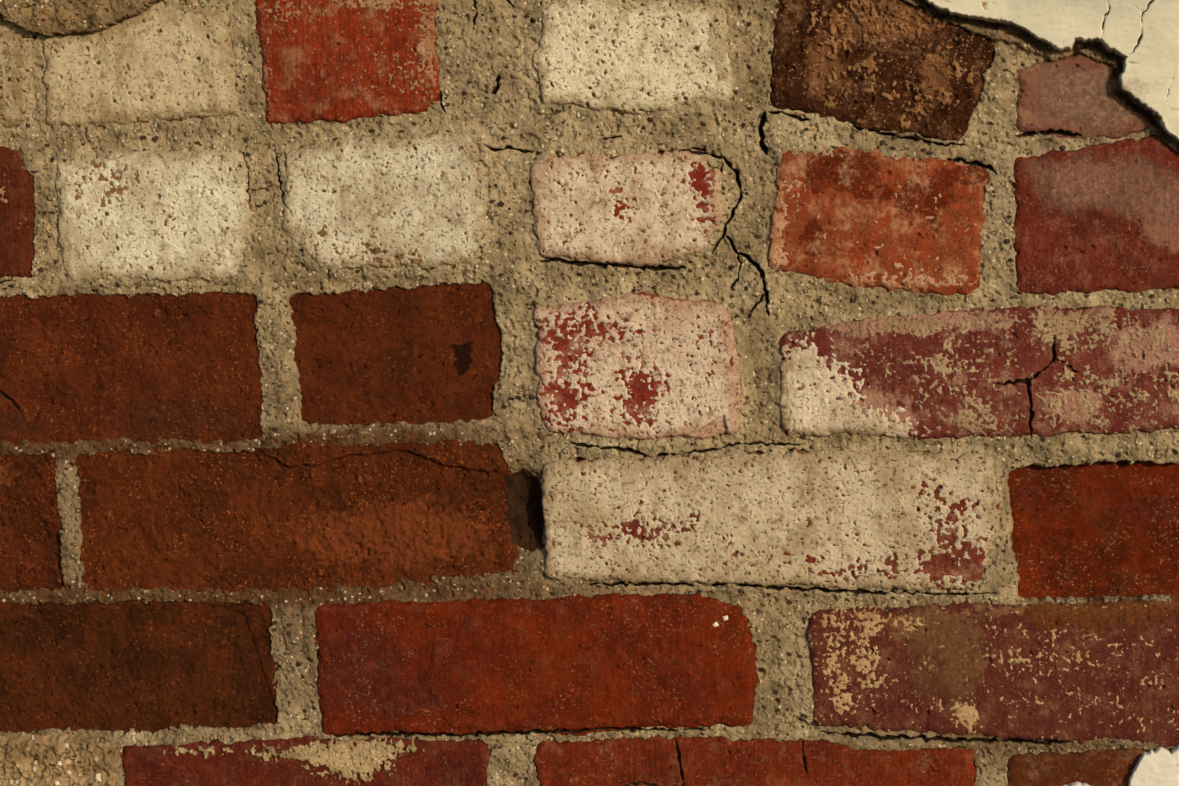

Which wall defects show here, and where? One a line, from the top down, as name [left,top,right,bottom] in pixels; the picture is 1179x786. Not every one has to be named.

peeling [0,0,239,128]
peeling [532,0,734,114]
peeling [807,3,980,131]
crack [1102,0,1154,60]
peeling [55,147,253,283]
peeling [281,132,489,270]
peeling [529,149,724,267]
crack [679,147,770,318]
crack [0,391,20,411]
crack [995,337,1078,435]
peeling [504,292,1179,741]
crack [625,737,684,786]